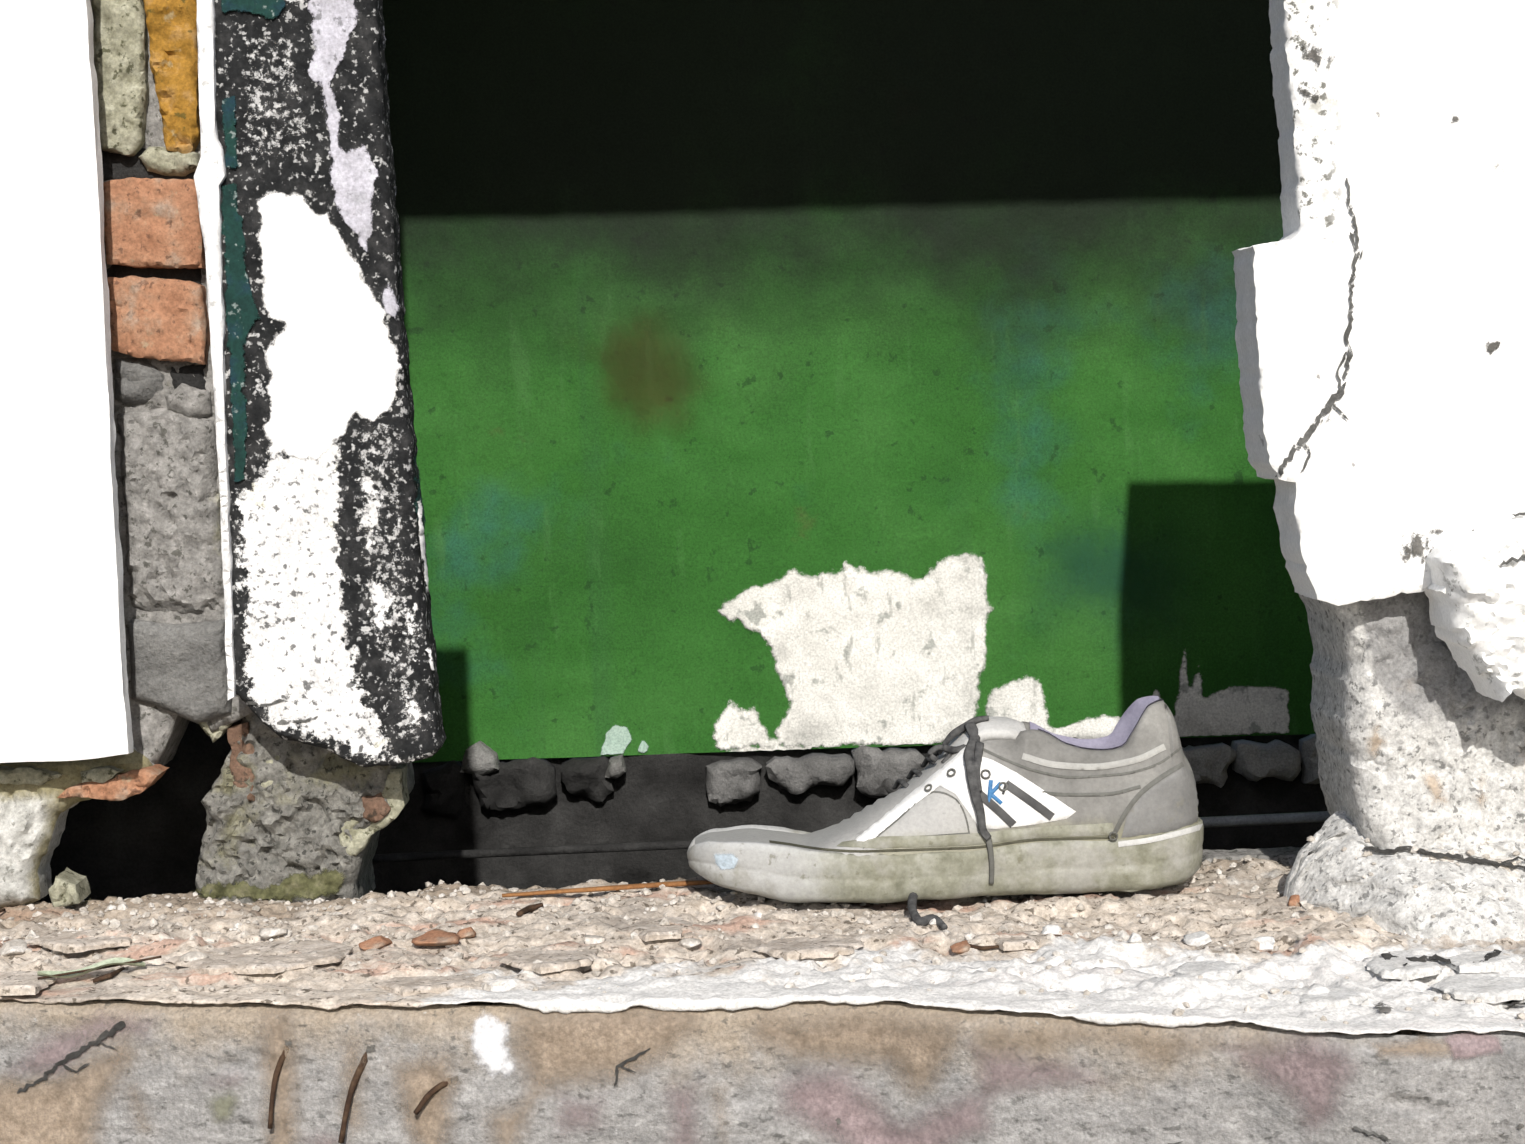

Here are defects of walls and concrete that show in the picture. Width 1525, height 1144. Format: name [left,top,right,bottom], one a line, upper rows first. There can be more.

peeling [199,0,434,856]